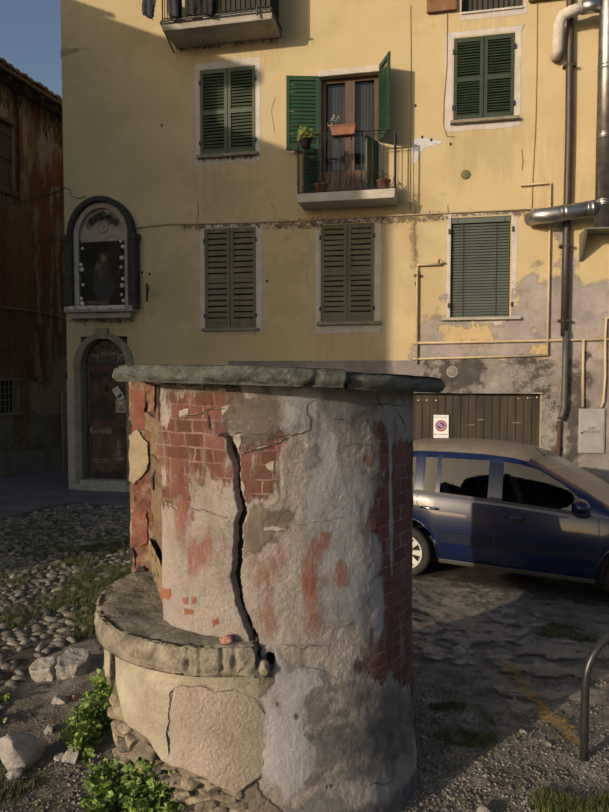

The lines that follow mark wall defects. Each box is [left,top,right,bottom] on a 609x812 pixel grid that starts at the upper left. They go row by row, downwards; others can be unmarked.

peeling [408,221,609,360]
flaking render [154,383,284,520]
crack [165,398,322,659]
flaking render [353,419,414,704]
crack [284,622,356,679]
crack [166,685,235,756]
leakage [304,677,415,784]